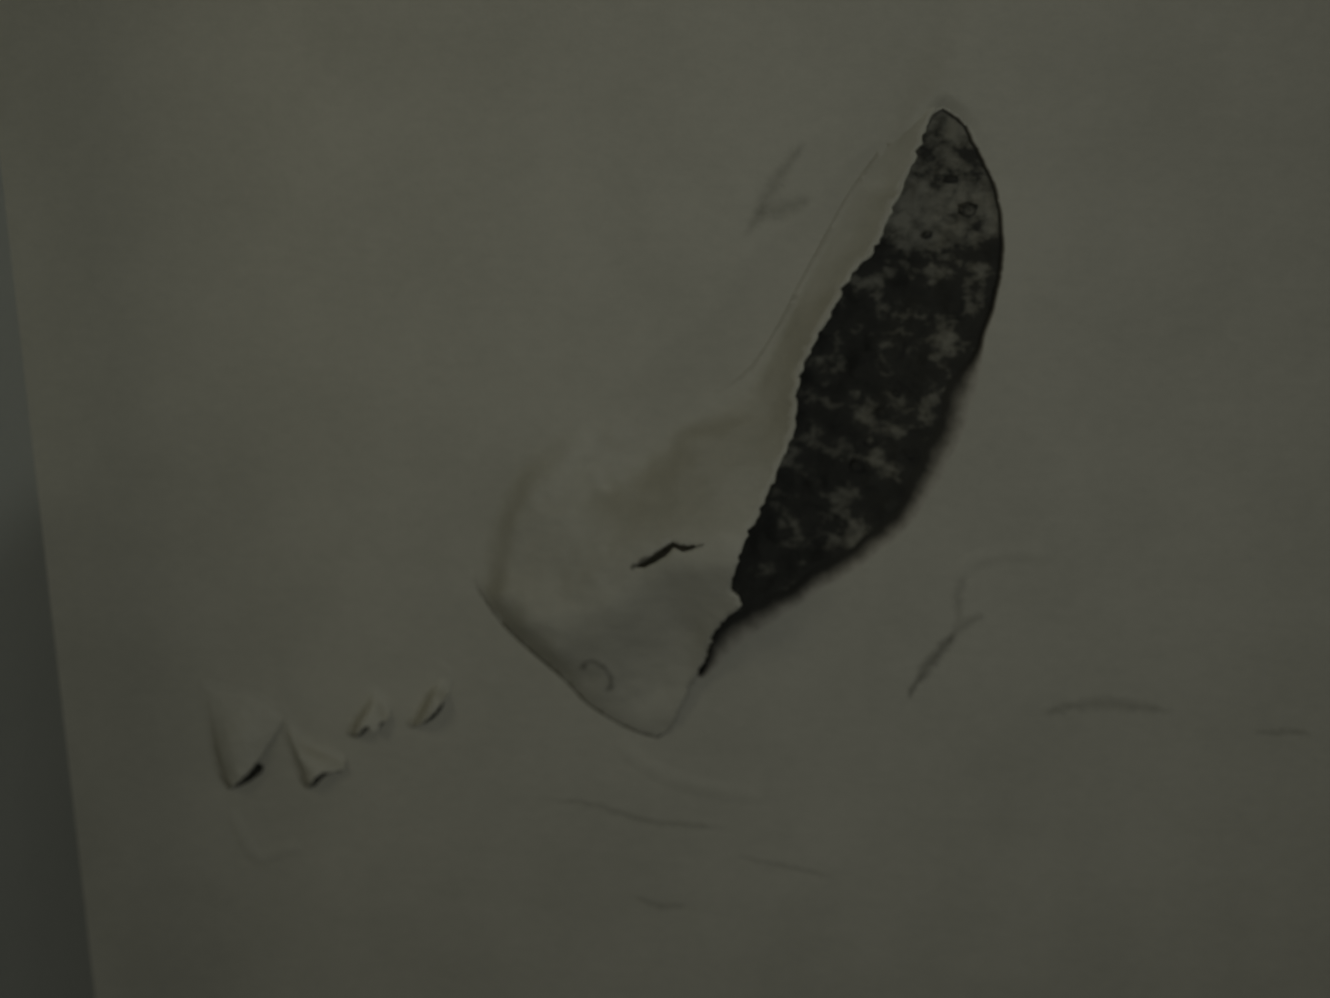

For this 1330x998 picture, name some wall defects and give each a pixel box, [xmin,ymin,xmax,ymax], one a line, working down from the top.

peeling [471,107,1005,738]